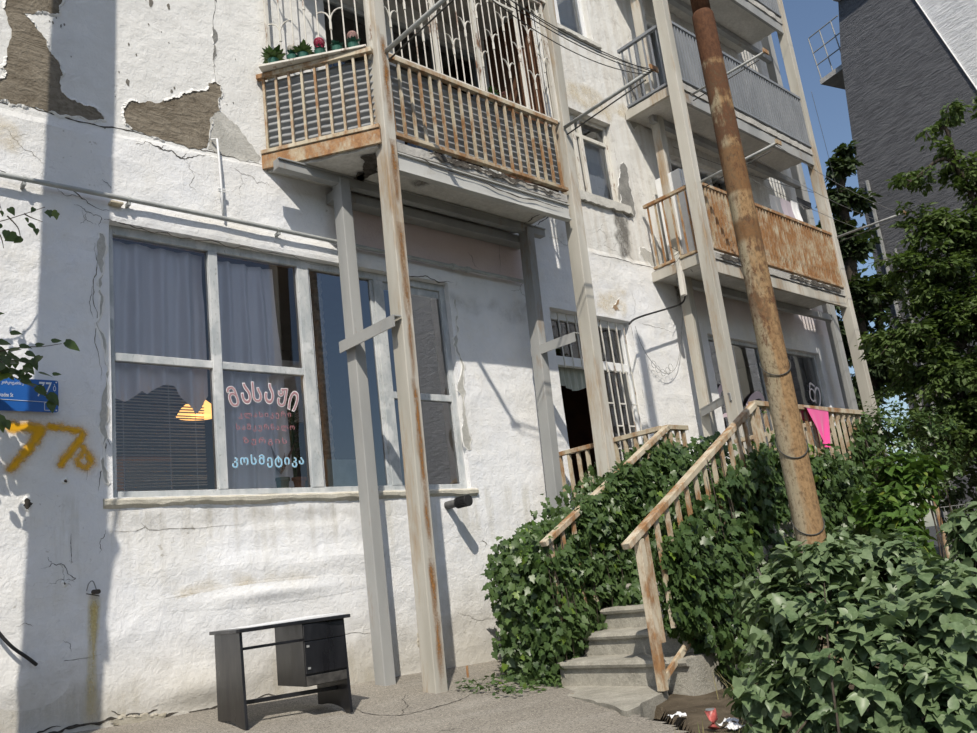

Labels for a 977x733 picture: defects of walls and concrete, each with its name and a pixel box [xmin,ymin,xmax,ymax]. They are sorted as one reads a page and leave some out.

peeling [0,0,107,129]
crack [32,107,269,193]
peeling [115,79,260,164]
crack [60,191,326,266]
spalling [354,153,378,182]
peeling [617,163,636,220]
rust [414,389,425,487]
peeling [21,496,34,512]
crack [100,525,227,549]
rust [90,602,98,657]
rust [429,564,442,665]
crack [37,706,217,733]